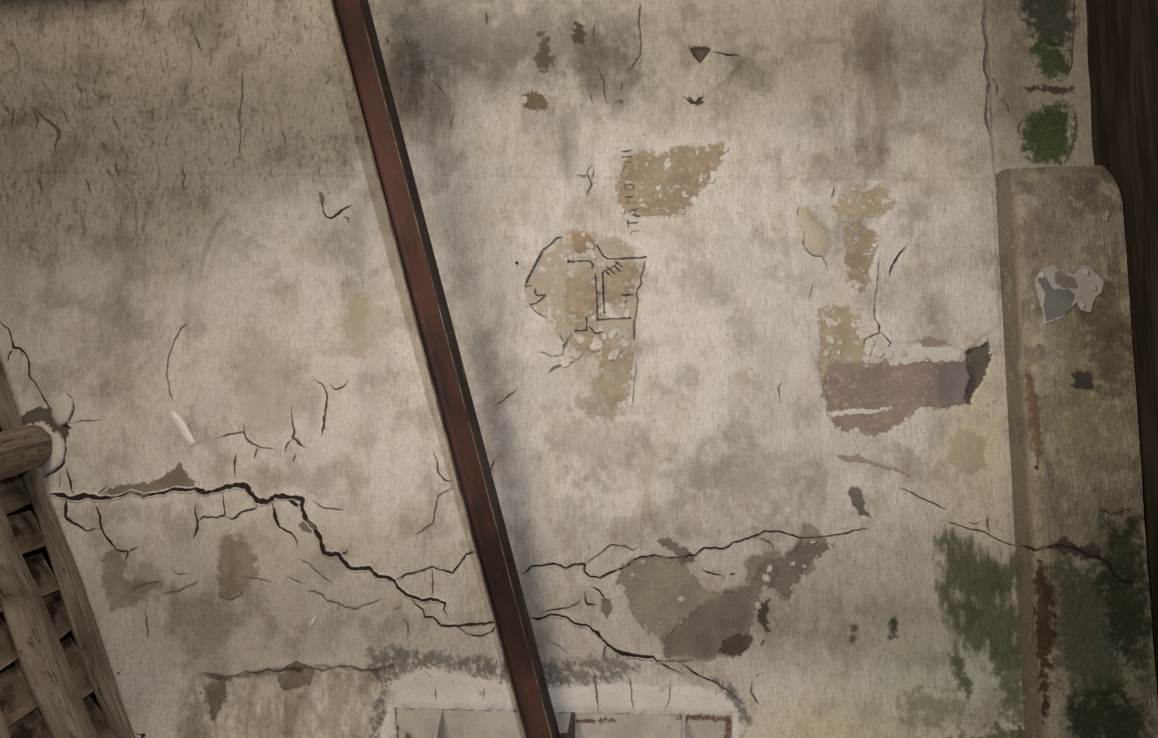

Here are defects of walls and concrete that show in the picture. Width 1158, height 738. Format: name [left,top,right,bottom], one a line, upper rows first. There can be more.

crack [981,11,1020,134]
spalling [615,142,728,217]
spalling [525,229,643,420]
peeling [817,305,970,436]
peeling [1034,265,1104,323]
spalling [101,462,196,498]
crack [0,321,495,639]
crack [199,661,383,677]
crack [519,528,869,712]
spalling [616,522,835,662]
crack [898,487,1135,582]
corrosion [1032,559,1057,724]